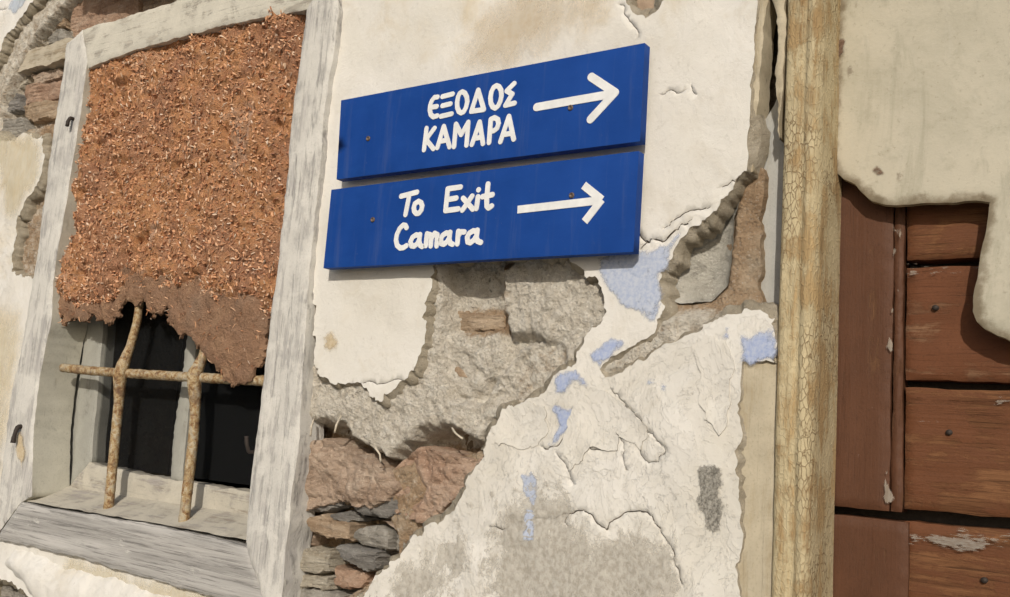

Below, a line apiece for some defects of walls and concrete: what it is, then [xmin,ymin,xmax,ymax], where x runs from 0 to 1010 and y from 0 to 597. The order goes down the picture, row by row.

spalling [0,0,177,138]
spalling [22,200,44,275]
spalling [604,168,769,374]
spalling [300,259,606,597]
flaking render [553,390,649,471]
crack [590,392,666,465]
flaking render [481,476,679,597]
crack [565,510,682,583]
spalling [697,465,723,532]
peeling [884,481,894,503]